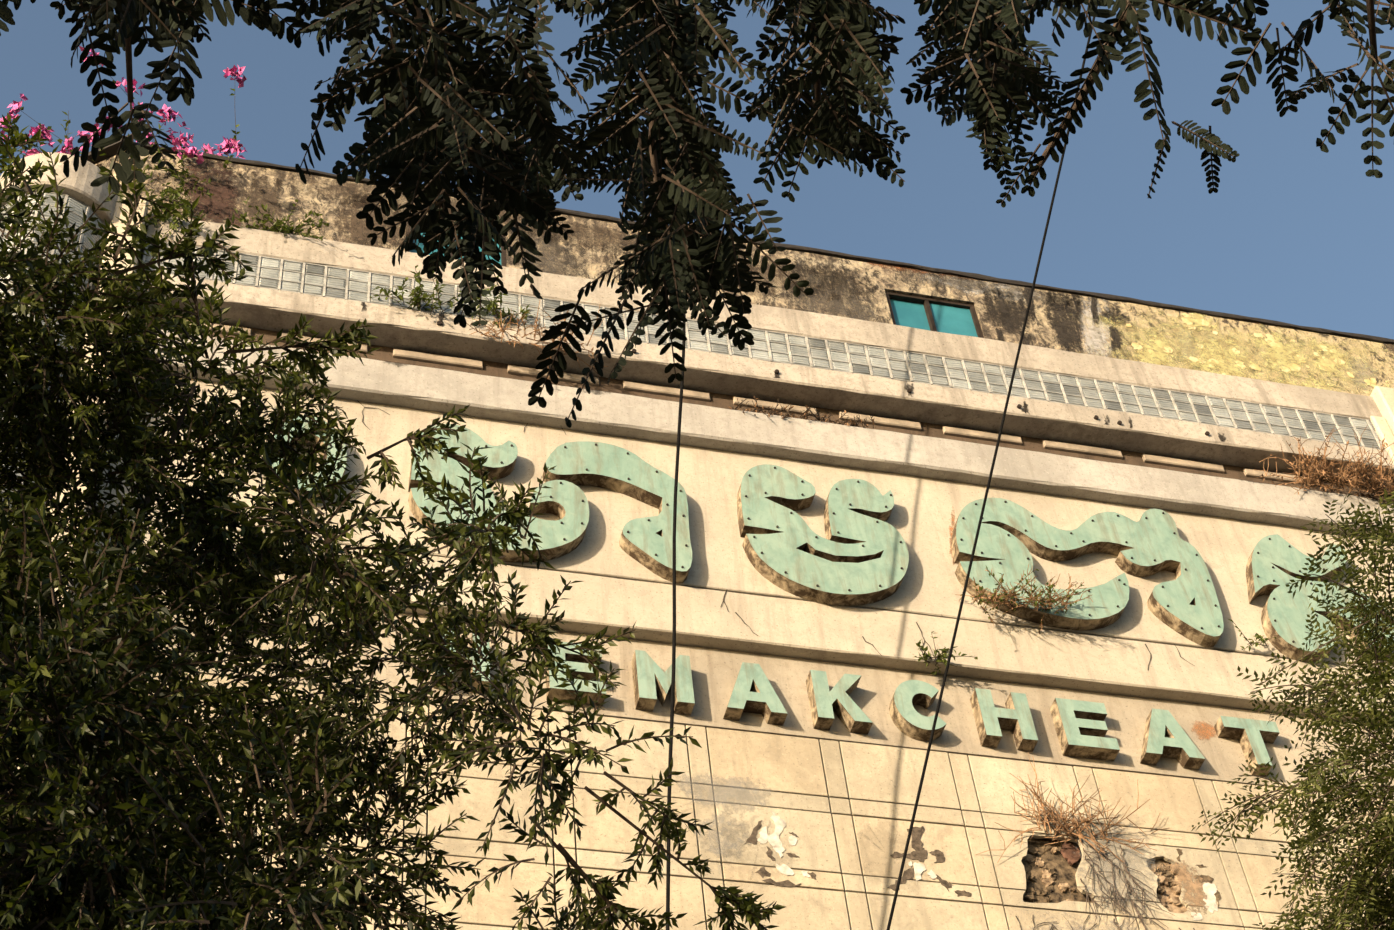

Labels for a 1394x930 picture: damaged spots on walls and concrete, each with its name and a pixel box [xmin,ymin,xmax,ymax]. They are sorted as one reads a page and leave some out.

leakage [241,171,464,249]
leakage [498,210,661,287]
leakage [733,257,876,321]
leakage [900,271,1129,357]
spalling [743,812,817,887]
spalling [887,826,972,897]
spalling [1021,839,1094,903]
spalling [1147,848,1221,921]